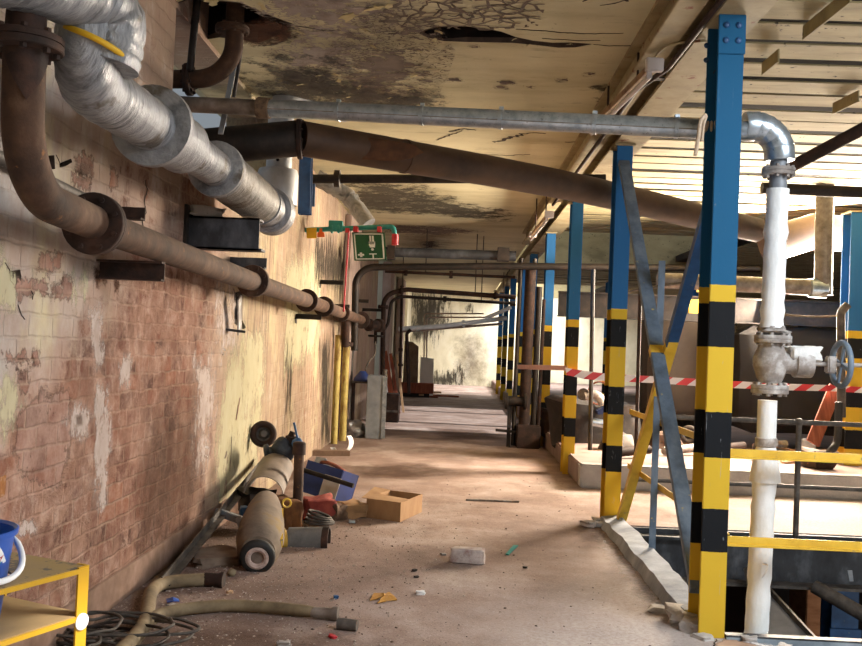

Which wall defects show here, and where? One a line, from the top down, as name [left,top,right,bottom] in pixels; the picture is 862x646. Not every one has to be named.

peeling [203,0,463,104]
damp [239,54,445,107]
crack [381,0,631,48]
peeling [49,150,94,193]
damp [346,183,516,248]
peeling [5,249,74,304]
damp [313,232,344,297]
efflorescence [88,309,105,364]
peeling [1,348,72,488]
efflorescence [71,385,111,509]
damp [283,344,292,430]
damp [319,334,331,446]